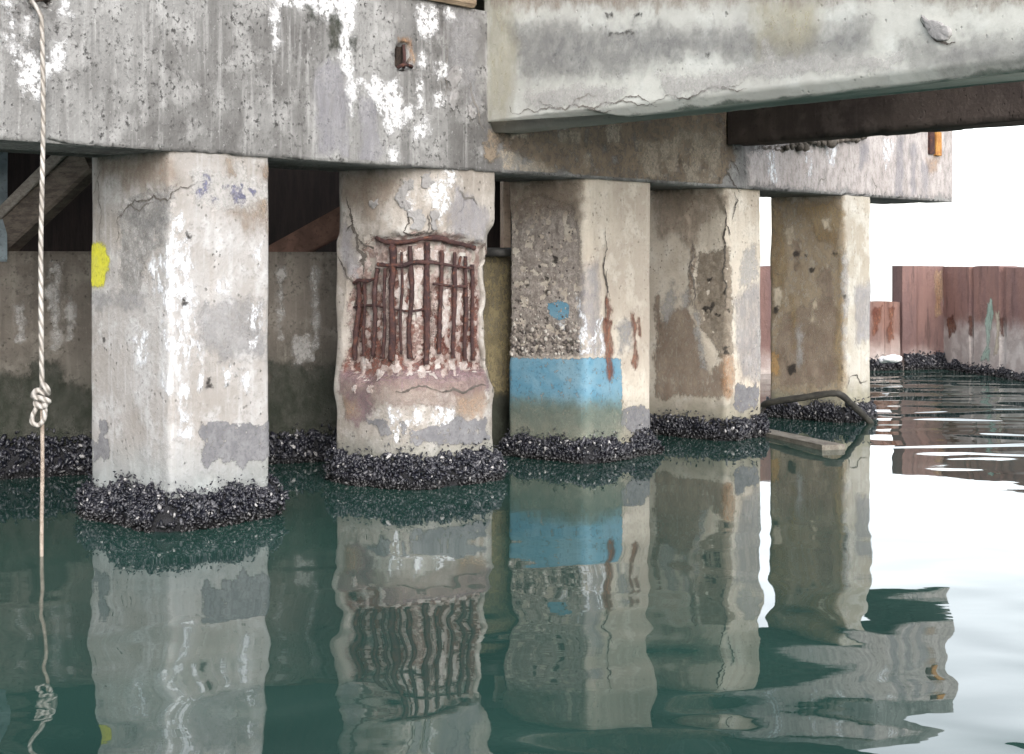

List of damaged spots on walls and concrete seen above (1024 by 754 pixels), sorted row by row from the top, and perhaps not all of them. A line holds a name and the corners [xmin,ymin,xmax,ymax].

peeling [921,15,955,45]
crack [510,83,744,114]
crack [338,199,376,318]
spalling [342,172,487,394]
crack [403,189,478,236]
spalling [509,194,584,359]
crack [602,227,610,313]
crack [719,160,740,307]
corrosion [603,297,613,381]
corrosion [631,314,641,370]